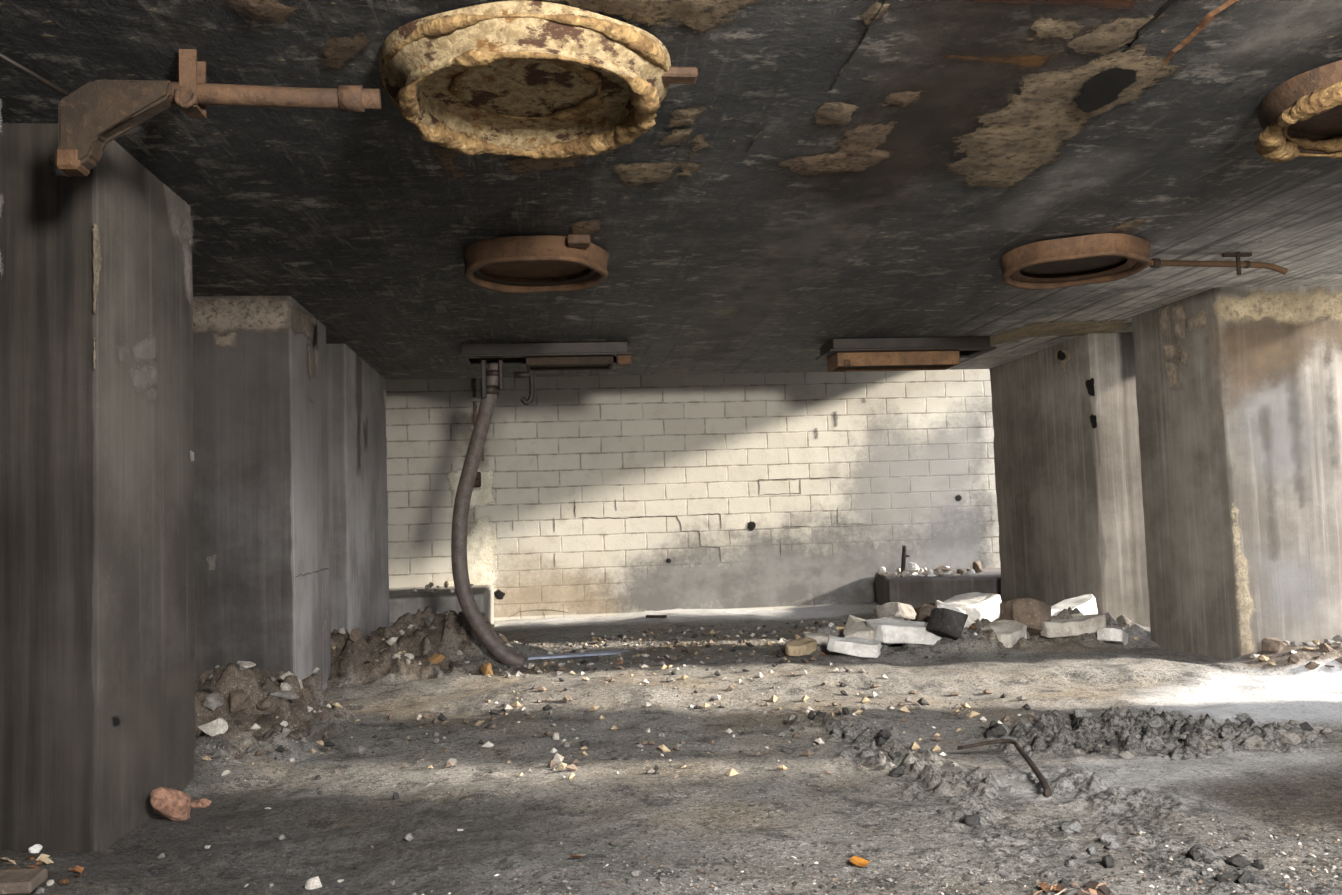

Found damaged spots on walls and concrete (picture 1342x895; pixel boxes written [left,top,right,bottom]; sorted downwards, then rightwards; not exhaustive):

flaking render [224,0,301,25]
flaking render [535,0,759,34]
crack [1129,0,1175,48]
crack [1160,0,1238,68]
rust [833,0,1135,196]
flaking render [941,12,1186,191]
flaking render [164,184,318,379]
flaking render [1213,287,1342,324]